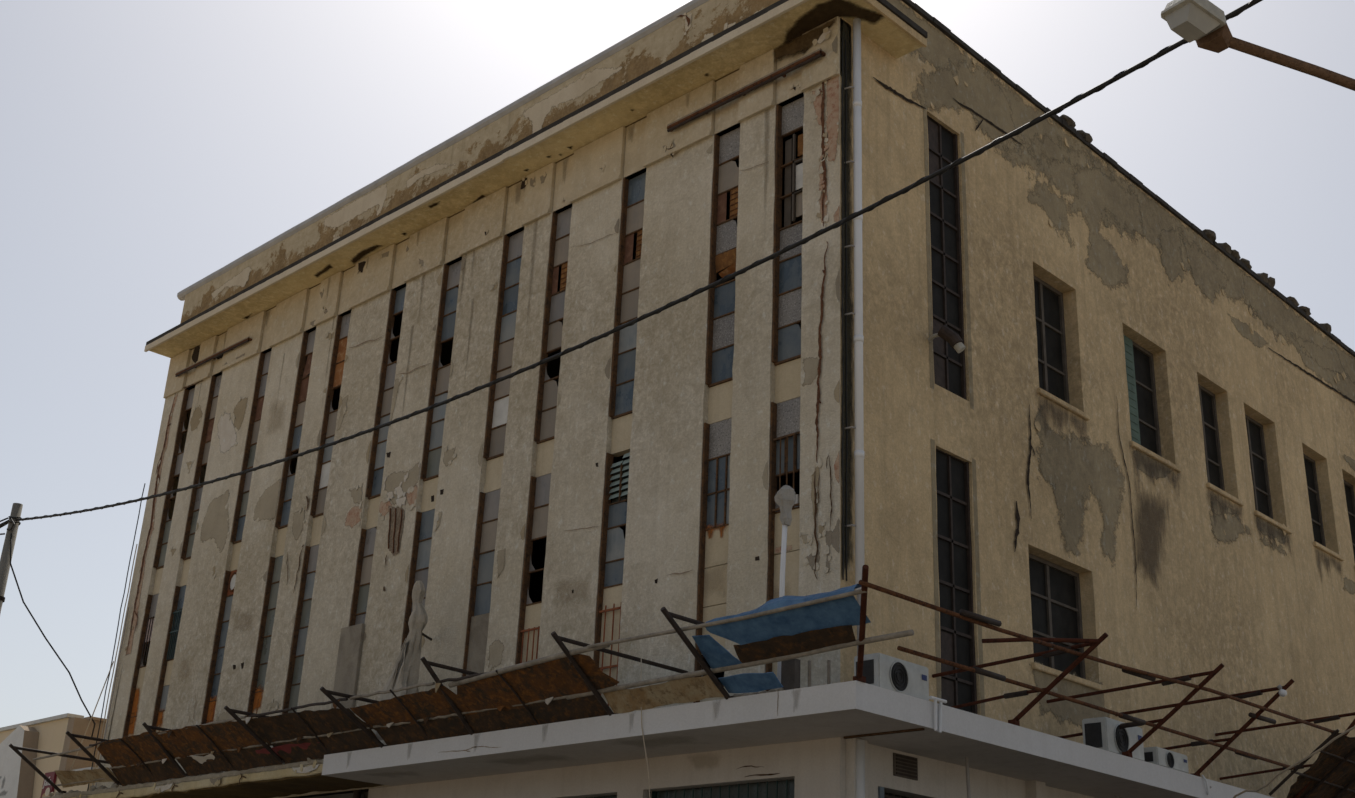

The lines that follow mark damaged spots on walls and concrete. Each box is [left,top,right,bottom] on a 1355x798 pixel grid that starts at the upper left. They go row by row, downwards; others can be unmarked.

peeling [701,10,761,42]
flaking render [812,27,831,46]
peeling [520,66,622,134]
spalling [810,75,840,223]
crack [873,77,1022,145]
flaking render [887,0,1355,383]
crack [814,78,832,579]
flaking render [233,396,248,430]
flaking render [196,490,230,579]
flaking render [379,463,420,583]
flaking render [1034,407,1173,563]